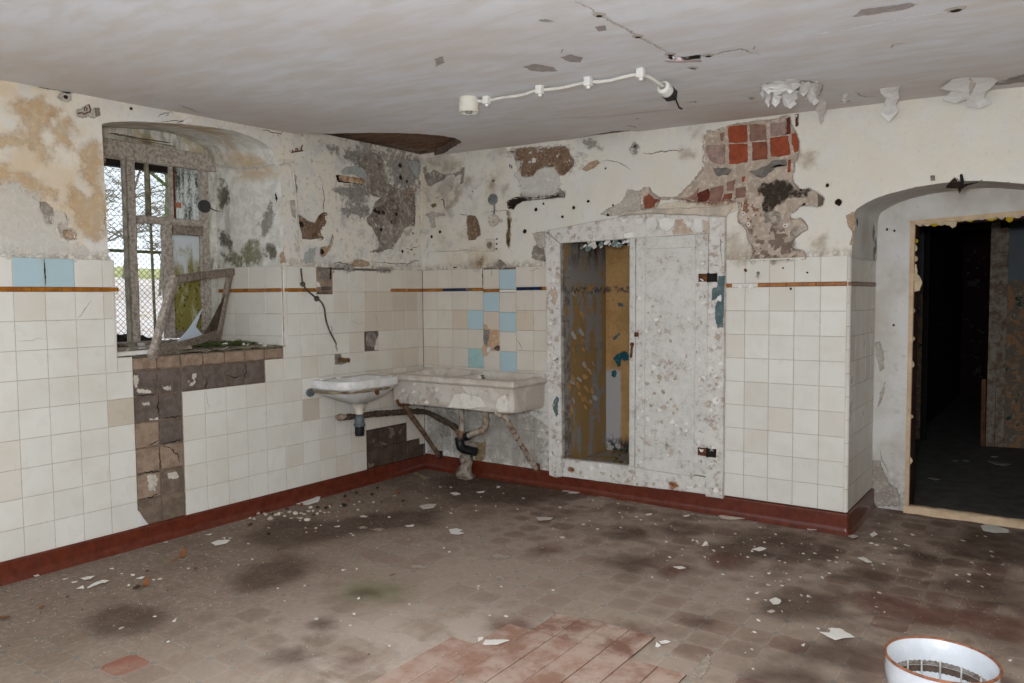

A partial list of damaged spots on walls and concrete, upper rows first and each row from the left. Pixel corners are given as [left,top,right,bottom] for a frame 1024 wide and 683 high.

crack [575,1,669,53]
peeling [880,86,900,122]
peeling [940,77,997,108]
water stain [0,98,107,240]
spalling [290,175,334,291]
spalling [352,135,461,267]
spalling [466,215,481,241]
spalling [503,144,606,218]
spalling [580,79,858,279]
peeling [366,423,423,469]